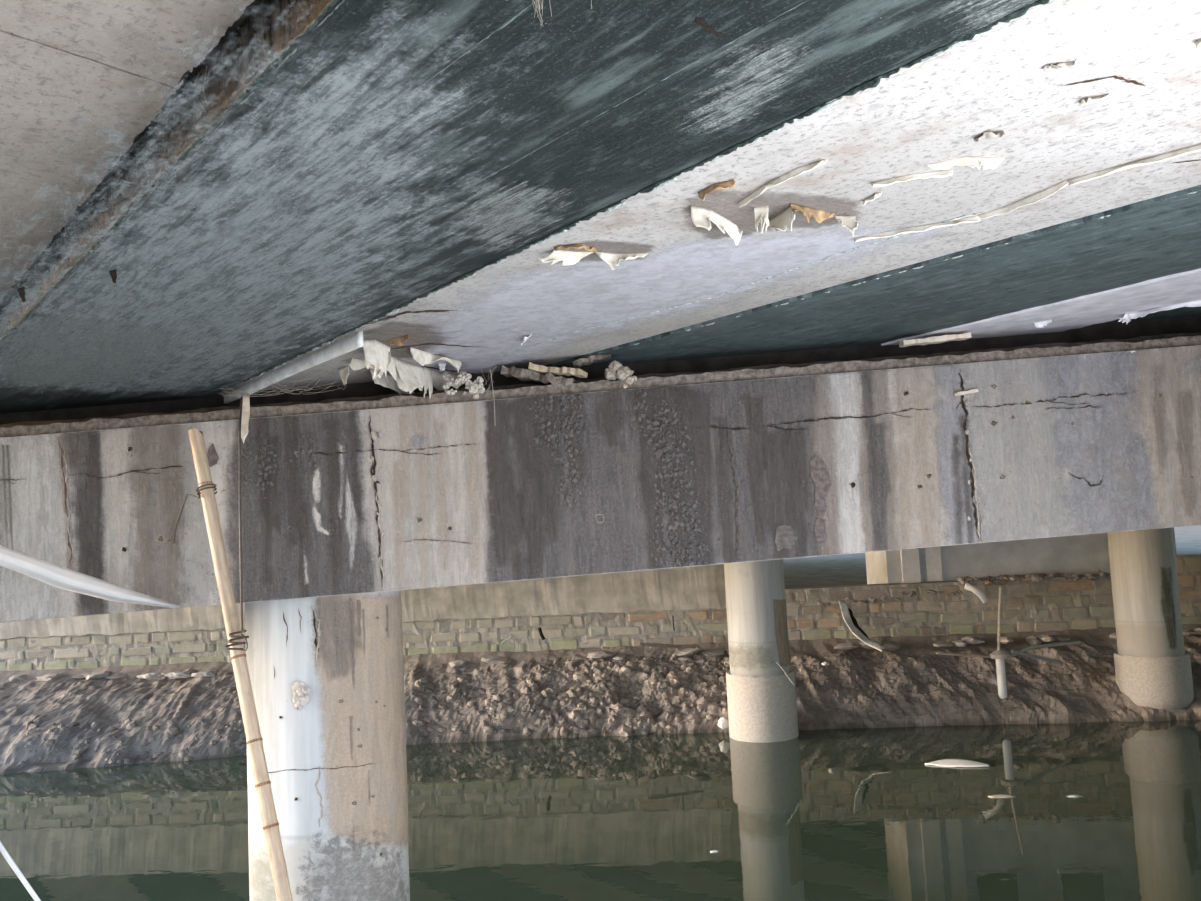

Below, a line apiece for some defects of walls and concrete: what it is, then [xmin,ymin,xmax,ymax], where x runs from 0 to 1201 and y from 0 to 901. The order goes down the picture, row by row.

peeling [1043,58,1077,72]
peeling [1079,92,1111,106]
peeling [339,334,462,398]
peeling [537,243,649,270]
damp [418,228,932,375]
peeling [691,131,1201,245]
damp [0,425,185,622]
crack [315,411,480,591]
crack [697,366,1134,542]
damp [934,351,1158,545]